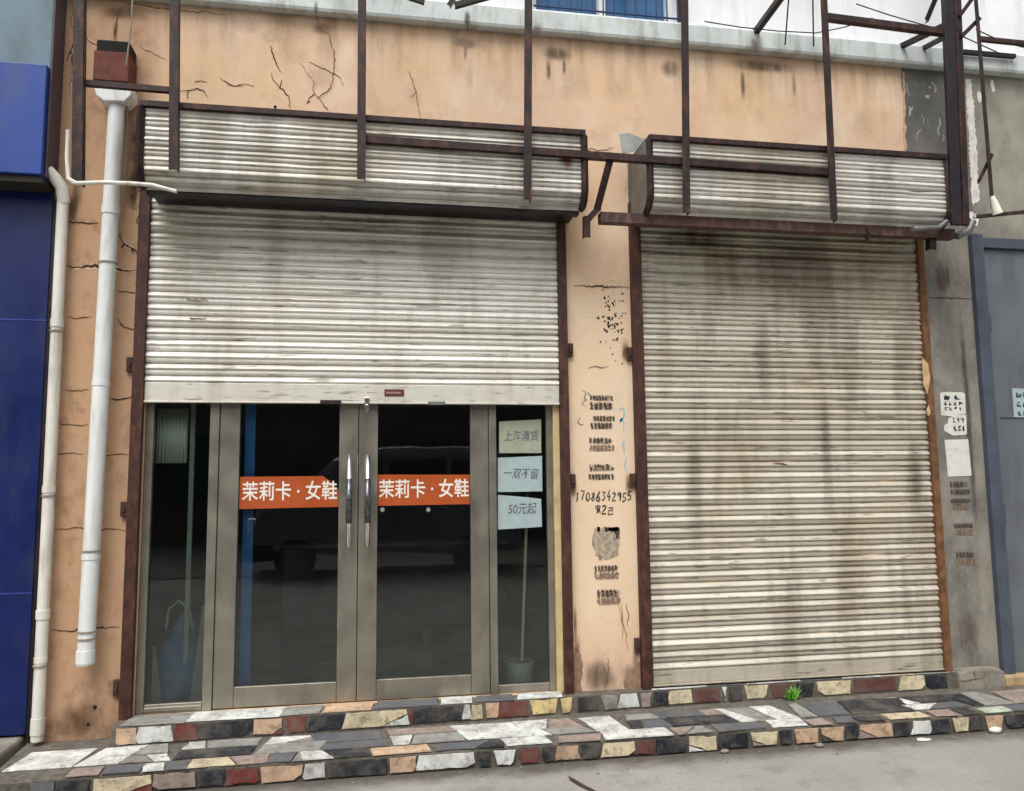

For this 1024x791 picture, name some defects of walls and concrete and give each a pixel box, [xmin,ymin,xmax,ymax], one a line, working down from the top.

crack [66,0,225,99]
crack [181,18,344,110]
crack [409,71,421,118]
crack [573,283,629,291]